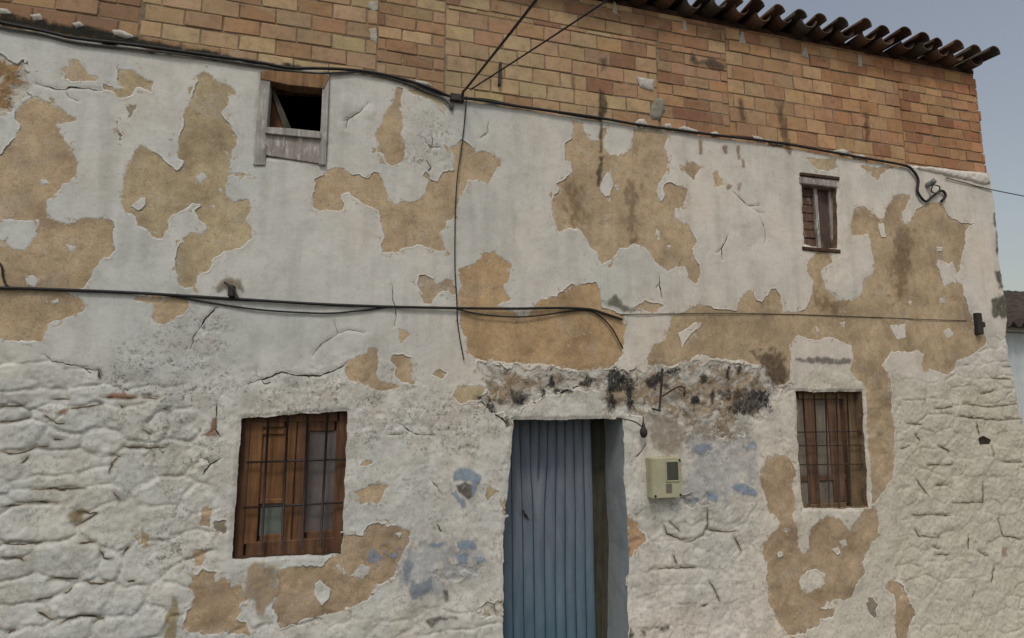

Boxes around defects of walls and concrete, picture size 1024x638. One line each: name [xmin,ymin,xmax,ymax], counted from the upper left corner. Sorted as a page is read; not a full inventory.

leakage [599,91,607,139]
peeling [0,51,118,345]
peeling [121,72,254,324]
peeling [311,86,501,255]
peeling [550,121,701,286]
crack [247,323,360,384]
leakage [607,387,634,412]
peeling [416,194,986,638]
peeling [199,507,228,534]
peeling [182,550,251,636]
peeling [269,521,410,631]